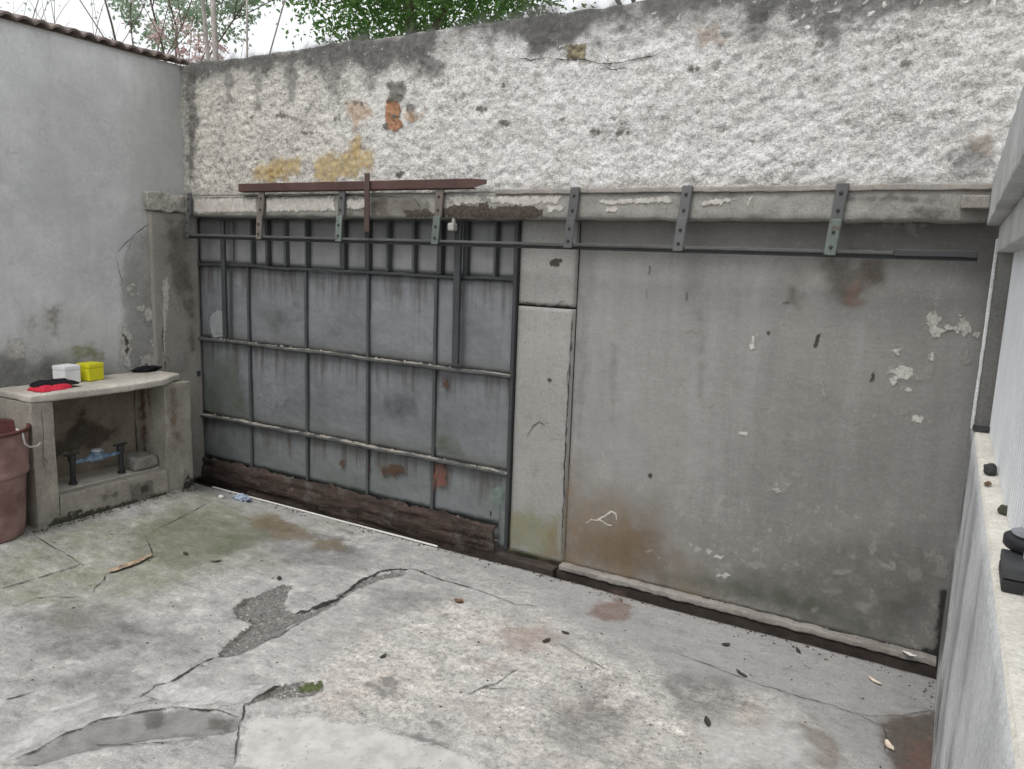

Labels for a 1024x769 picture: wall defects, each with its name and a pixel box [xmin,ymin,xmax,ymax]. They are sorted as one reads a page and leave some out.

water stain [454,1,622,53]
water stain [643,0,973,40]
water stain [186,29,443,170]
crack [116,224,149,280]
peeling [926,304,981,338]
peeling [870,344,935,392]
corrosion [365,464,405,478]
crack [2,535,105,606]
spalling [217,570,406,657]
crack [271,568,534,639]
crack [469,668,519,694]
crack [3,657,281,764]